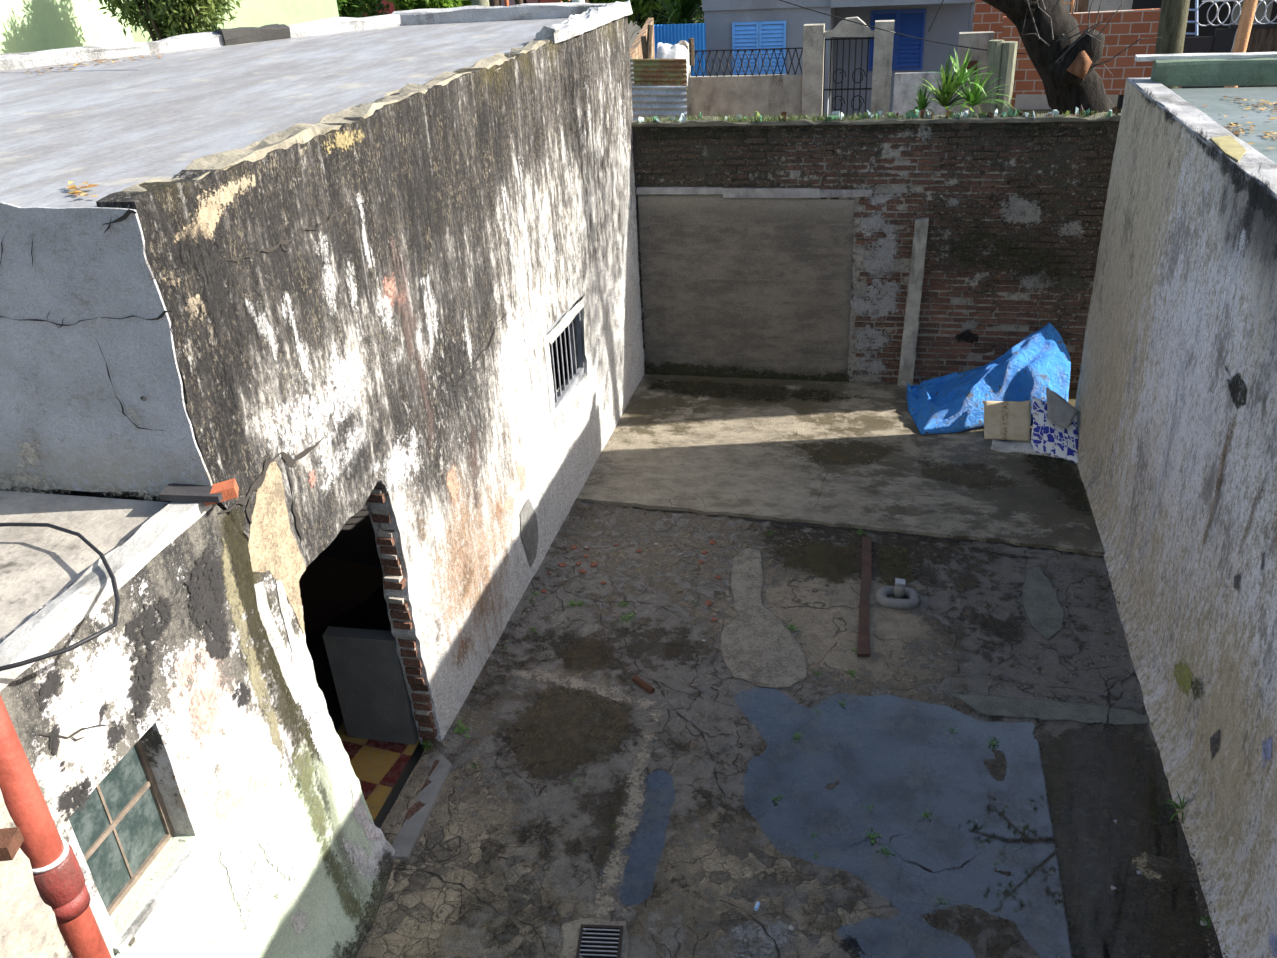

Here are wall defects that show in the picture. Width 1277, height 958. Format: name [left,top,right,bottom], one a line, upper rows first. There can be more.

crack [0,230,33,266]
crack [0,311,174,431]
crack [103,209,136,233]
leakage [140,173,422,493]
leakage [390,120,472,430]
leakage [1133,79,1277,312]
peeling [436,463,528,653]
leakage [36,663,64,712]
leakage [49,723,93,821]
leakage [98,507,394,958]
crack [543,578,748,844]
crack [394,868,546,956]